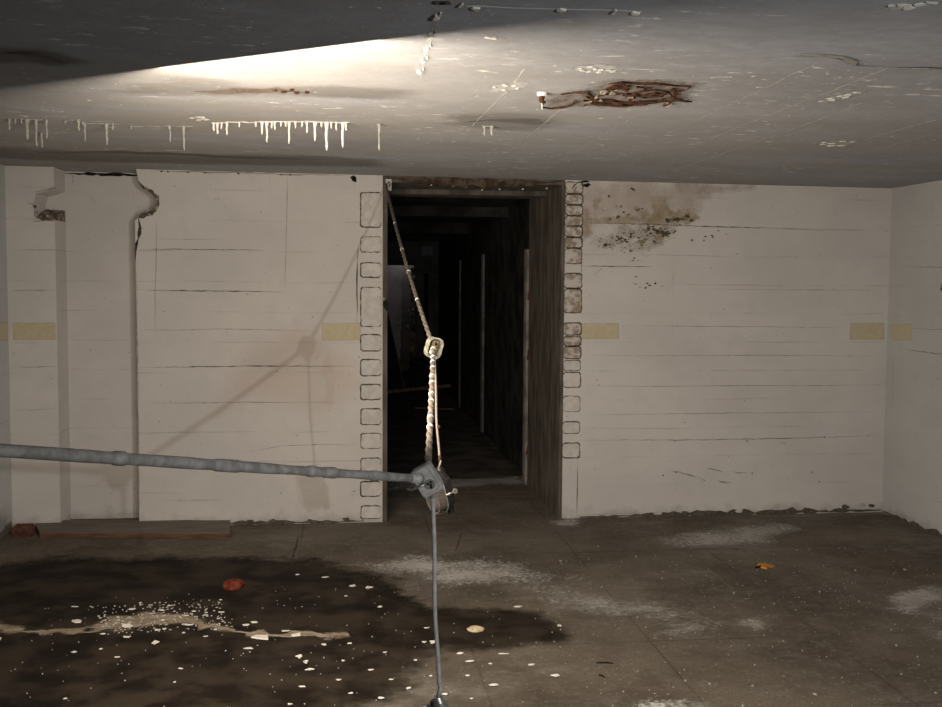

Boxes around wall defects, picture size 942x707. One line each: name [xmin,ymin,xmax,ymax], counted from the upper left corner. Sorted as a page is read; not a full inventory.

crack [675,54,942,148]
crack [135,218,234,261]
damp [582,195,697,262]